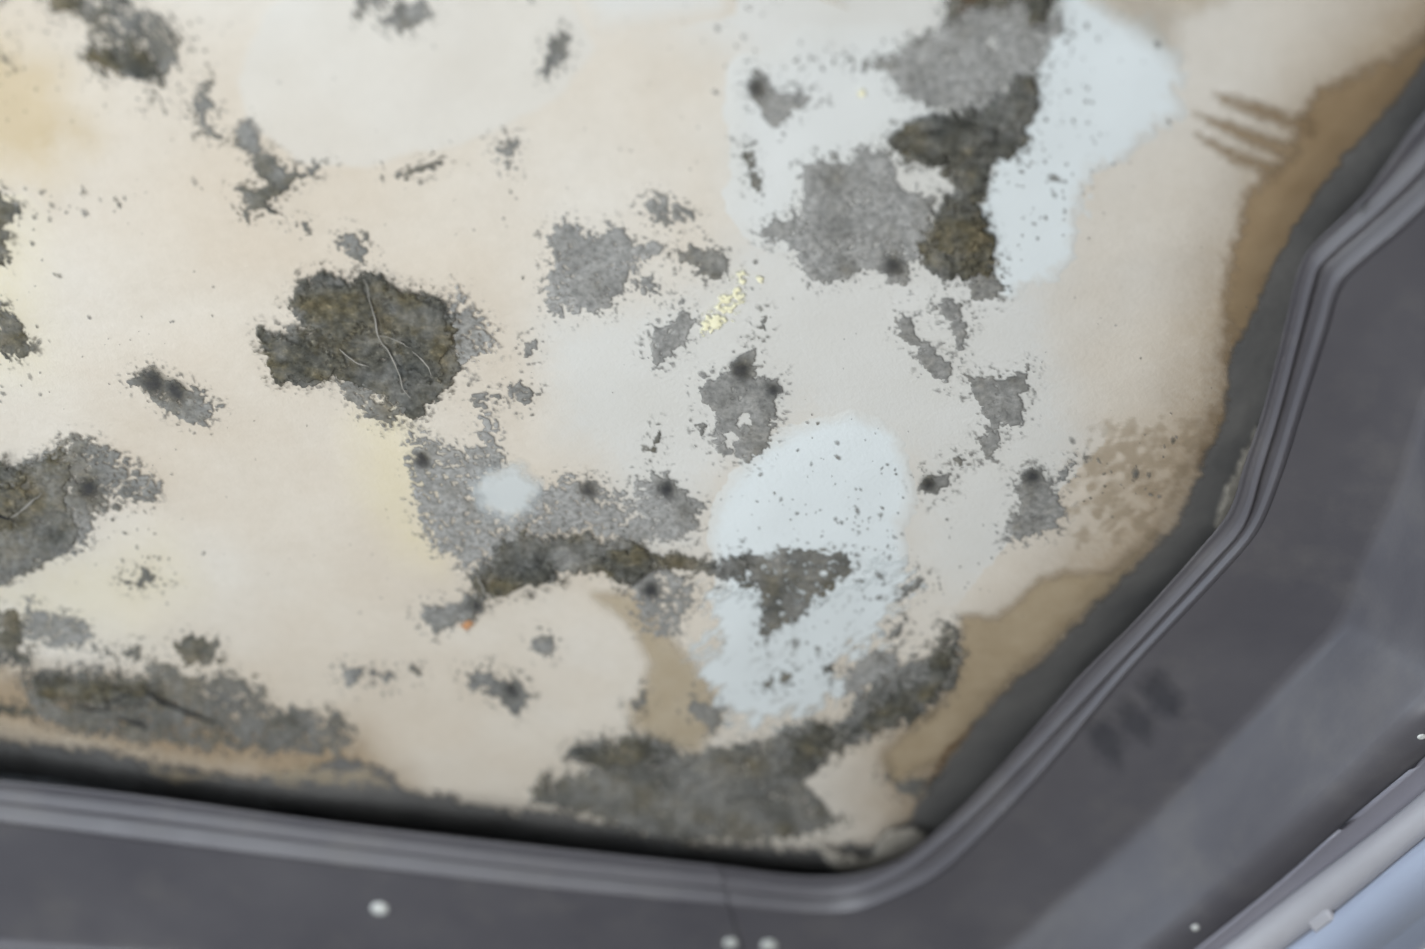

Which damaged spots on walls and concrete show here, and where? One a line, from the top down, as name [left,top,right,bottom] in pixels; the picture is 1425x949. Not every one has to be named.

leakage [156,15,223,140]
leakage [0,0,166,417]
leakage [522,192,731,319]
leakage [732,136,762,193]
leakage [689,307,789,476]
leakage [739,0,1425,850]
leakage [0,433,441,798]